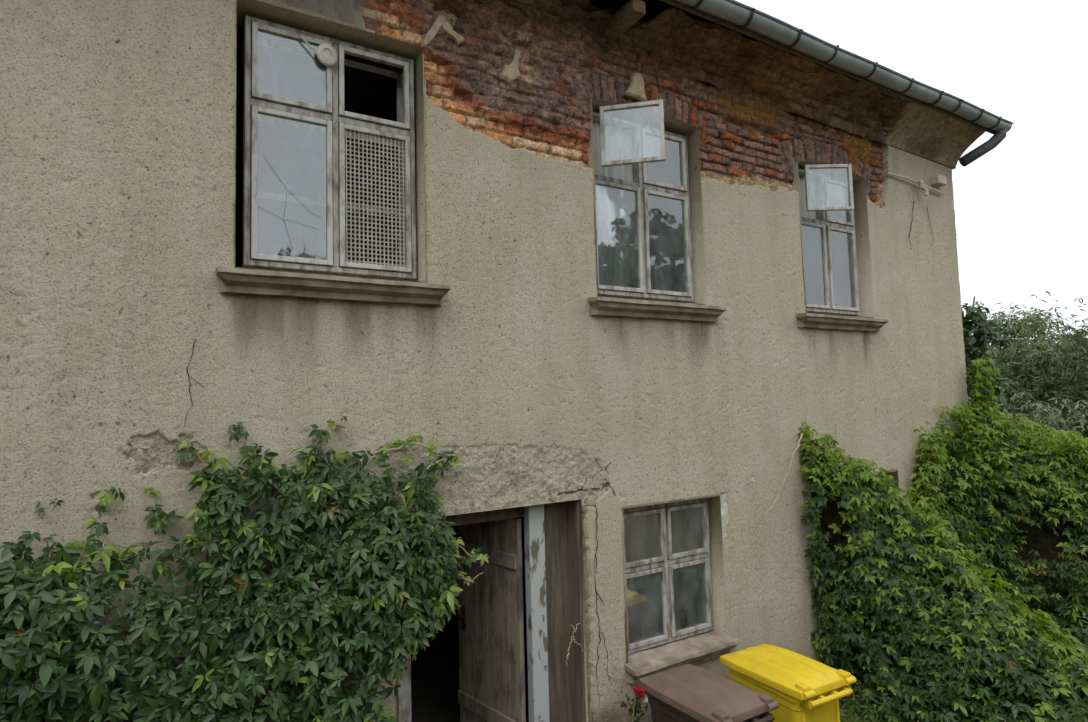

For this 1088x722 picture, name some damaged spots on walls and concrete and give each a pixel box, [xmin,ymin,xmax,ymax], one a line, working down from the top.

flaking render [355,0,884,209]
crack [182,339,203,431]
flaking render [379,442,609,722]